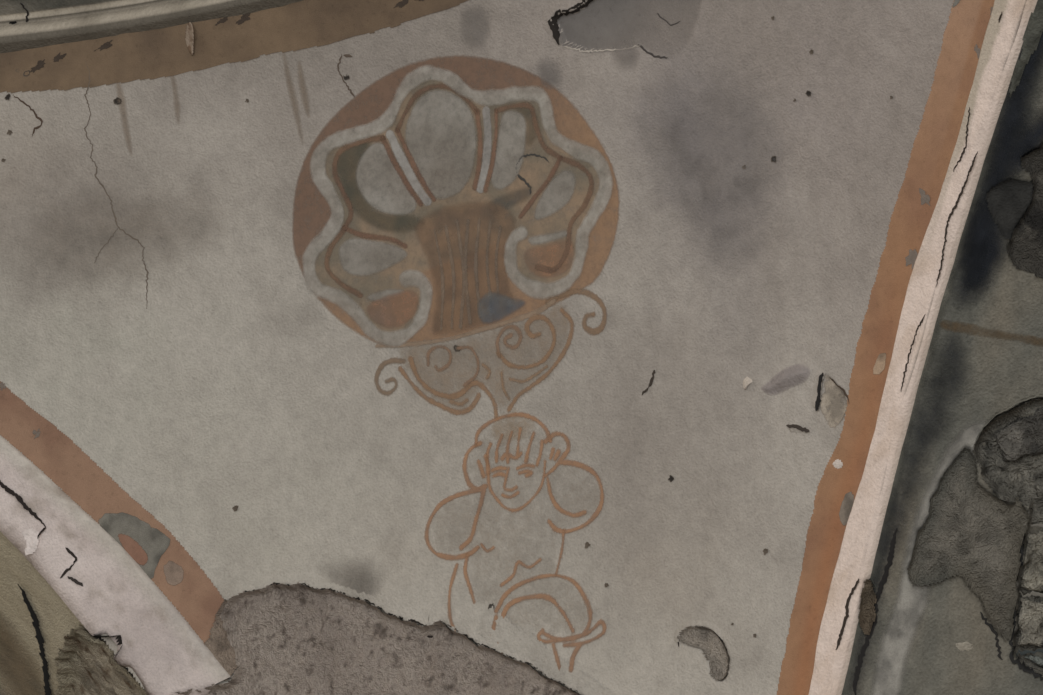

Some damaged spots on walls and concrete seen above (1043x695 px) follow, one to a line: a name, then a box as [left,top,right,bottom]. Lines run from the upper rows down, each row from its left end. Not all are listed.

peeling [542,0,699,59]
crack [13,94,43,136]
crack [936,107,978,286]
crack [901,315,925,389]
crack [0,480,46,539]
crack [60,548,83,586]
flaking render [907,395,1043,681]
crack [18,584,51,695]
flaking render [53,628,147,695]
flaking render [172,572,613,695]
flaking render [674,620,734,681]
flaking render [858,579,877,635]